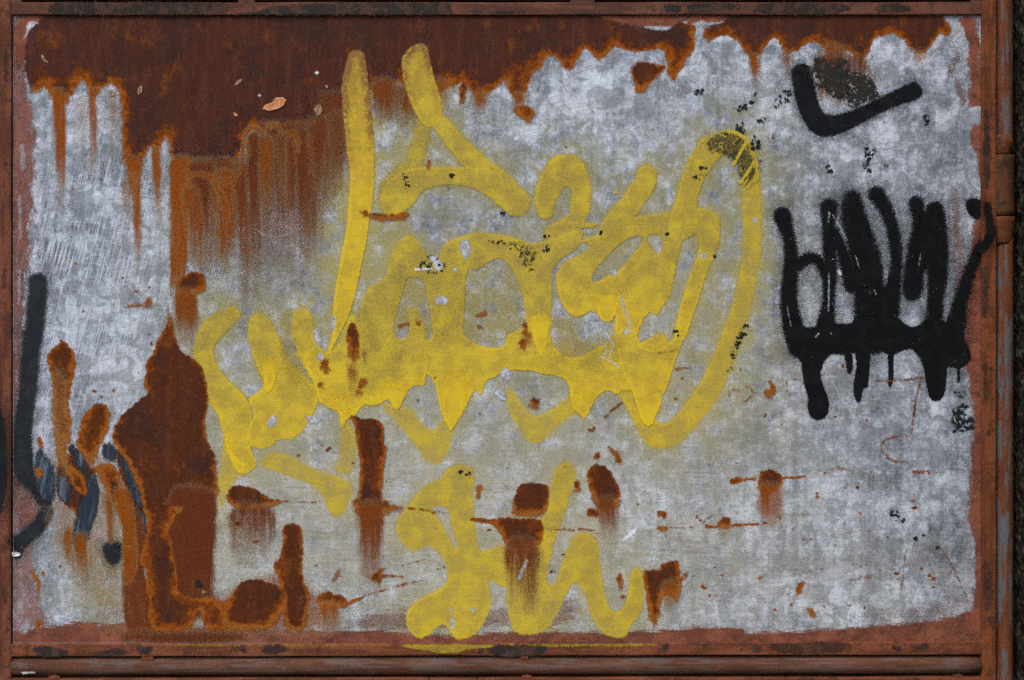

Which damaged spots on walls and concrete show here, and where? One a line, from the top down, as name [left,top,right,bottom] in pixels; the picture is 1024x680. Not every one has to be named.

rust [702,16,951,110]
rust [23,16,697,643]
rust [695,468,813,543]
rust [642,559,729,629]